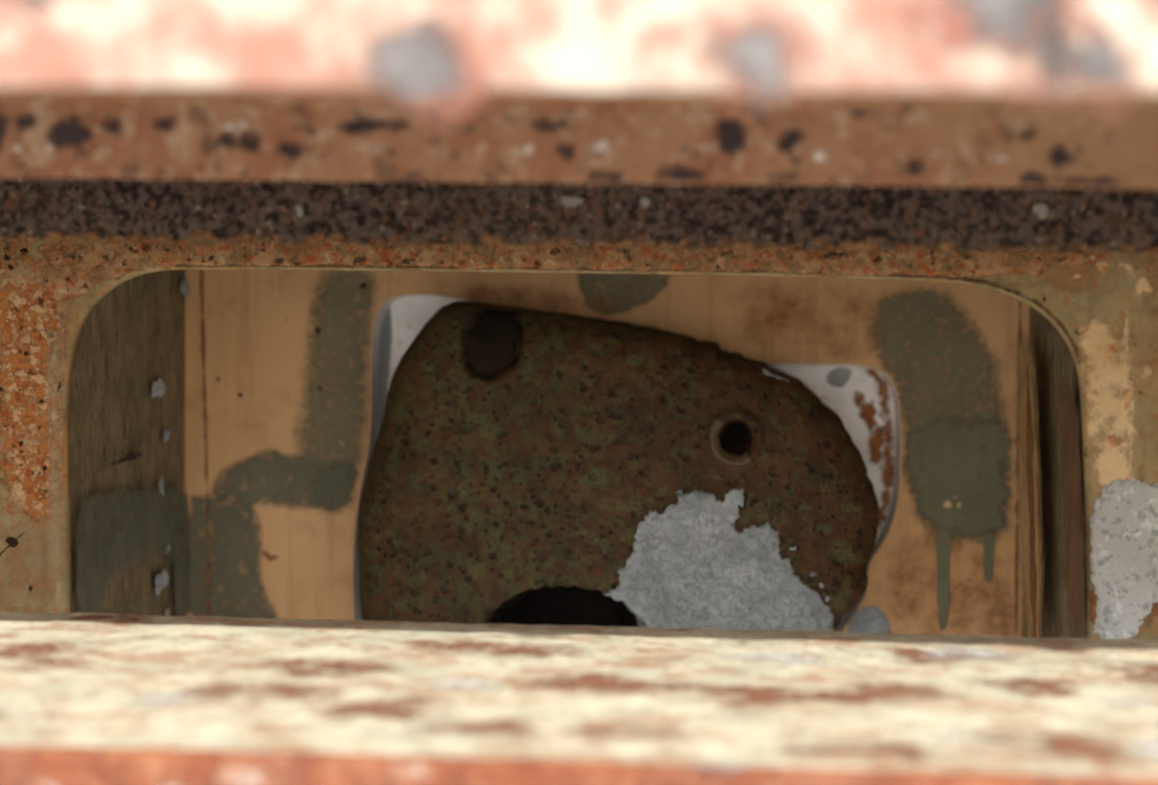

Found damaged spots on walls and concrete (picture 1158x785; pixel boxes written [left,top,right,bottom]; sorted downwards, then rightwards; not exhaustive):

spalling [827,367,852,388]
corrosion [0,231,1158,638]
peeling [604,488,891,633]
corrosion [853,745,929,761]
corrosion [984,735,1139,762]